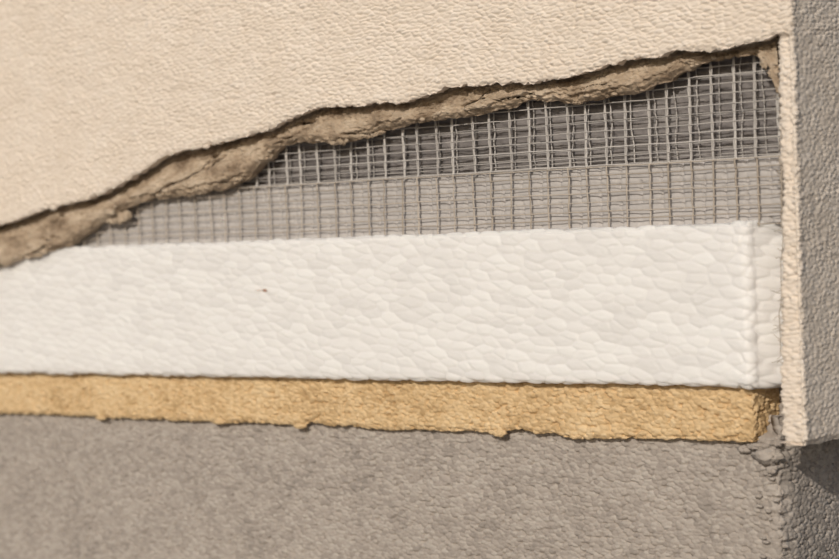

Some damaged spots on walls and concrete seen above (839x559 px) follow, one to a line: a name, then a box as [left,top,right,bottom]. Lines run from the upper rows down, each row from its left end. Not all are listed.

spalling [0,35,782,267]